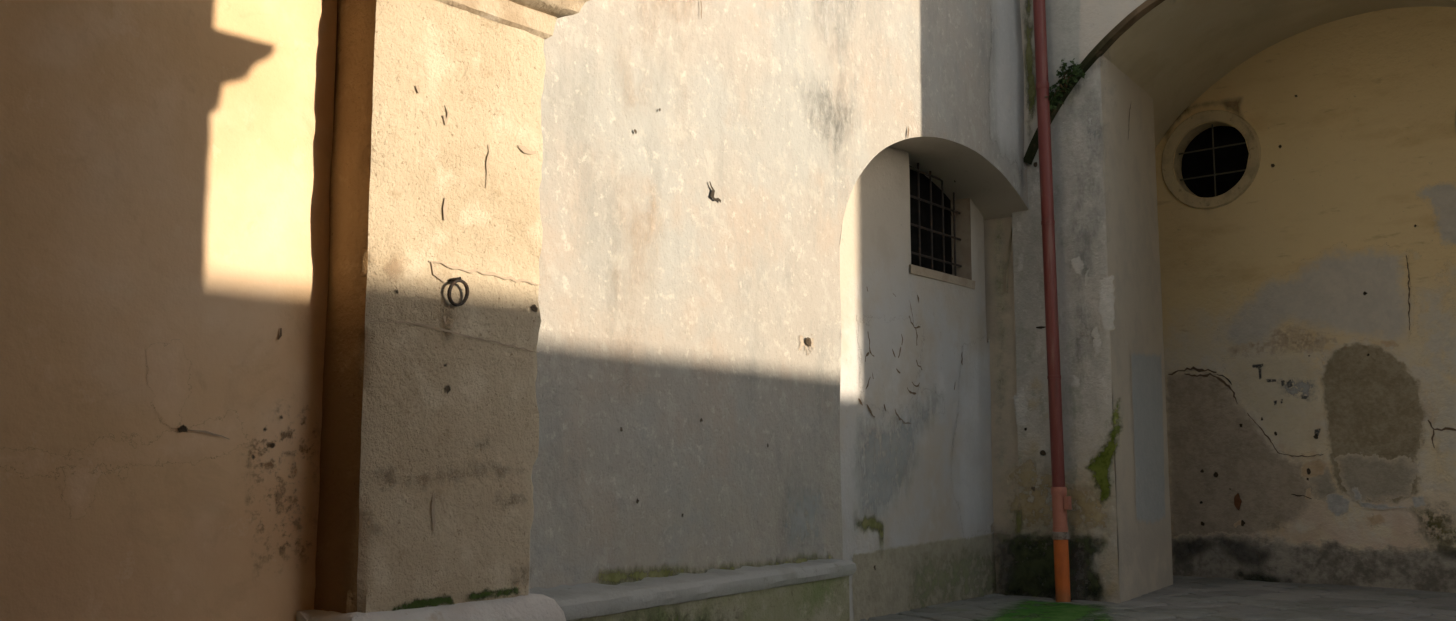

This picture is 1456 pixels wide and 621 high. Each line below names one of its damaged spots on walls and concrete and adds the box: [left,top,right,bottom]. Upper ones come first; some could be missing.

peeling [1070,256,1116,359]
damp [951,335,1107,539]
spalling [1165,340,1435,538]
damp [1171,531,1456,593]